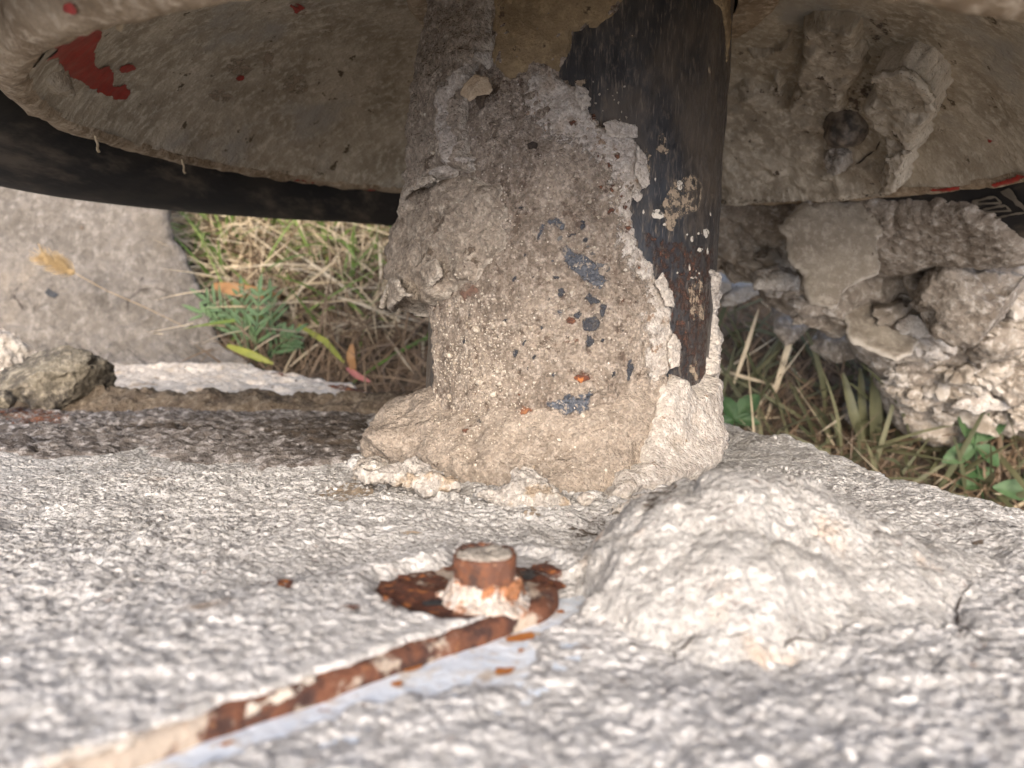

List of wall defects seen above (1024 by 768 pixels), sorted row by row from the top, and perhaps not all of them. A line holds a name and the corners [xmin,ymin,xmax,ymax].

peeling [47,30,136,100]
spalling [475,84,500,109]
corrosion [646,233,714,384]
corrosion [530,561,567,591]
corrosion [374,571,456,614]
corrosion [506,632,535,652]
corrosion [391,665,423,687]